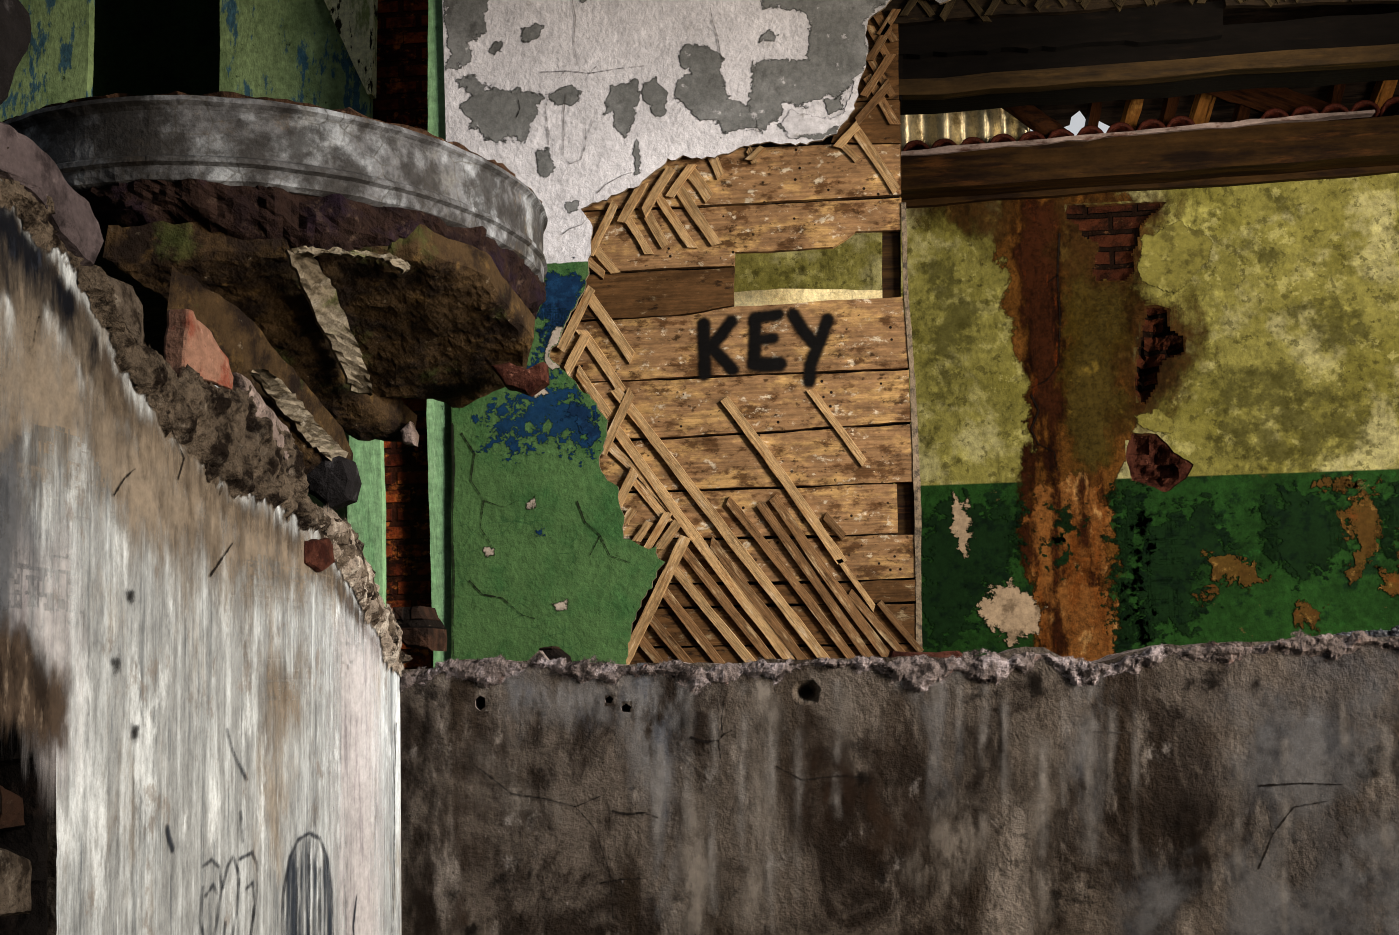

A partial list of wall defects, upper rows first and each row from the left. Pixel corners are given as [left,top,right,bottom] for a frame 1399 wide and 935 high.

peeling [443,0,583,178]
peeling [603,0,888,176]
spalling [0,176,1399,697]
corrosion [992,192,1149,662]
leakage [0,206,380,935]
crack [451,423,535,656]
crack [577,501,630,563]
leakage [401,746,437,935]
leakage [679,803,713,935]
leakage [792,726,985,858]
crack [1258,783,1343,869]
leakage [1258,710,1357,800]